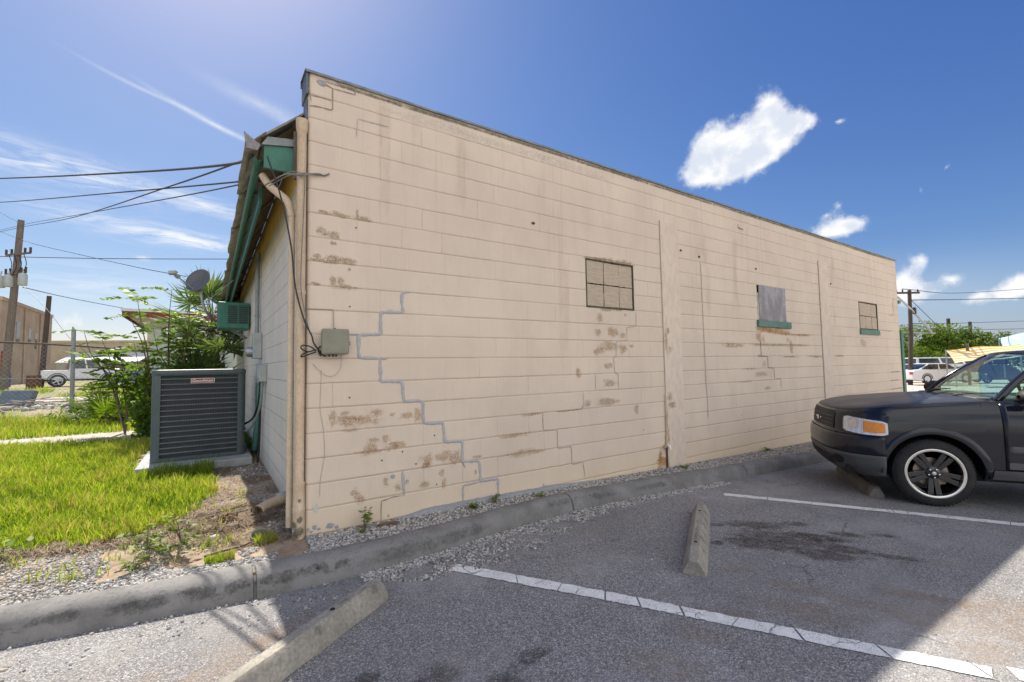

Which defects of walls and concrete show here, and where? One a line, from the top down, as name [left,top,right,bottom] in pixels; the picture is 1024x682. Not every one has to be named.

crack [381,471,405,511]
crack [349,291,499,501]